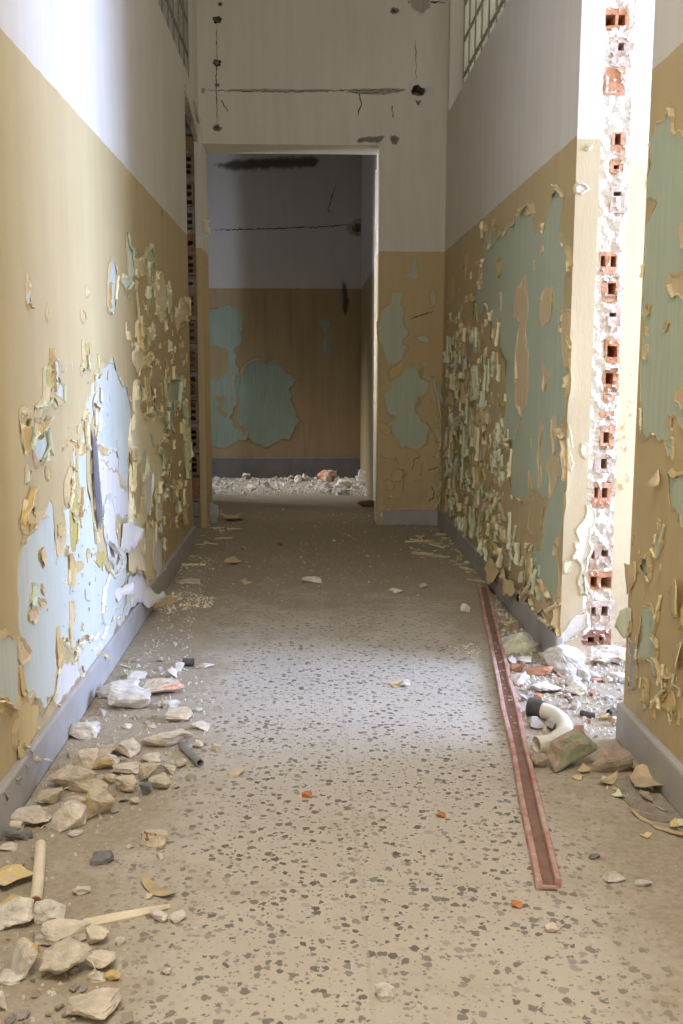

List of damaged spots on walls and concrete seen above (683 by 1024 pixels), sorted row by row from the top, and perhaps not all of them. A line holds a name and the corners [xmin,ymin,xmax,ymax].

crack [206,21,417,124]
crack [210,186,350,232]
peeling [373,0,683,664]
peeling [0,84,302,785]
peeling [627,591,683,727]